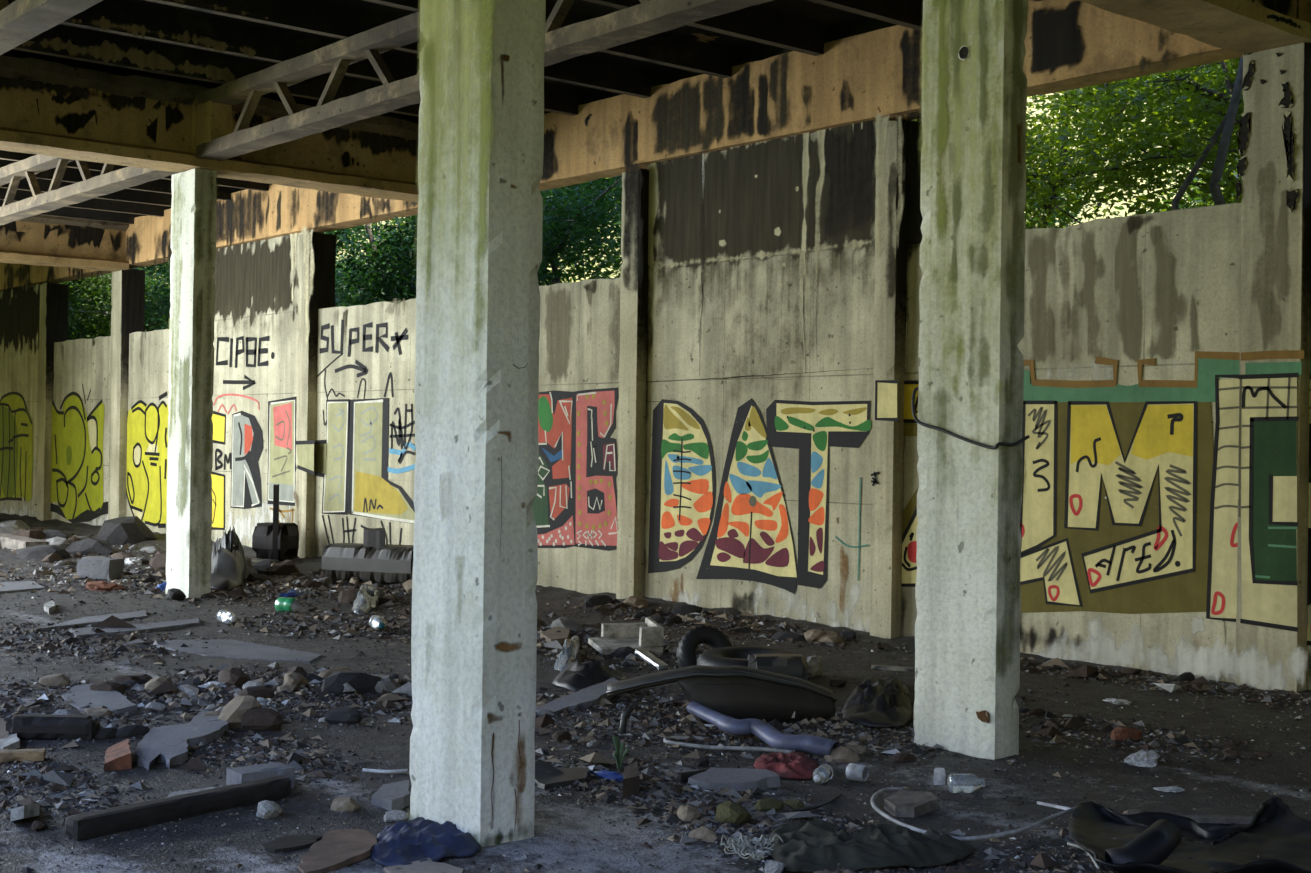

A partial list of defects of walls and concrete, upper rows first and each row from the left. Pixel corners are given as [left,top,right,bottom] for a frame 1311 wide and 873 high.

peeling [22,16,255,83]
spalling [958,45,970,61]
leakage [476,0,493,345]
leakage [584,49,788,419]
leakage [791,86,827,275]
leakage [840,0,986,300]
leakage [979,0,1198,502]
leakage [545,287,571,380]
rust [495,642,521,652]
leakage [996,524,1020,674]
leakage [1039,617,1304,690]
rust [517,740,526,800]